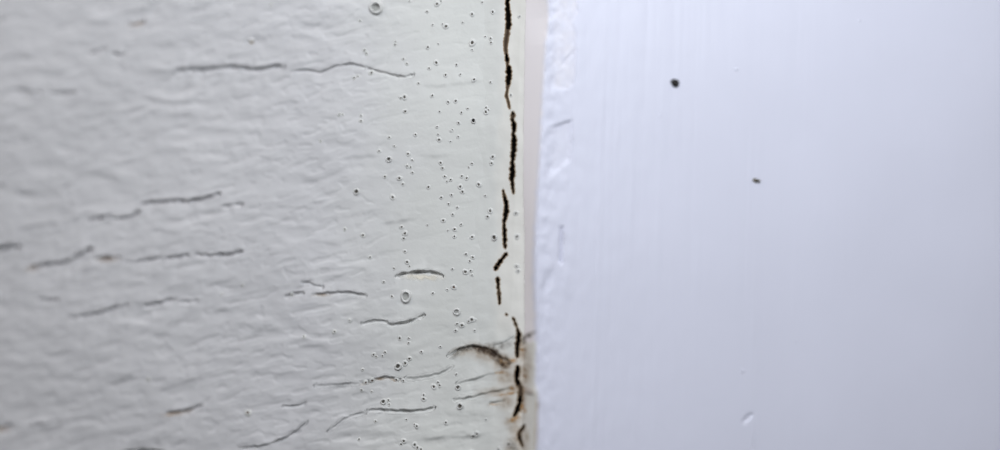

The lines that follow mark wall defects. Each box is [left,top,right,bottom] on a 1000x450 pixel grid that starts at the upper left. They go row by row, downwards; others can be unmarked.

crack [173,61,414,80]
crack [27,191,243,271]
crack [239,0,526,450]
crack [37,296,197,321]
rust [457,332,535,378]